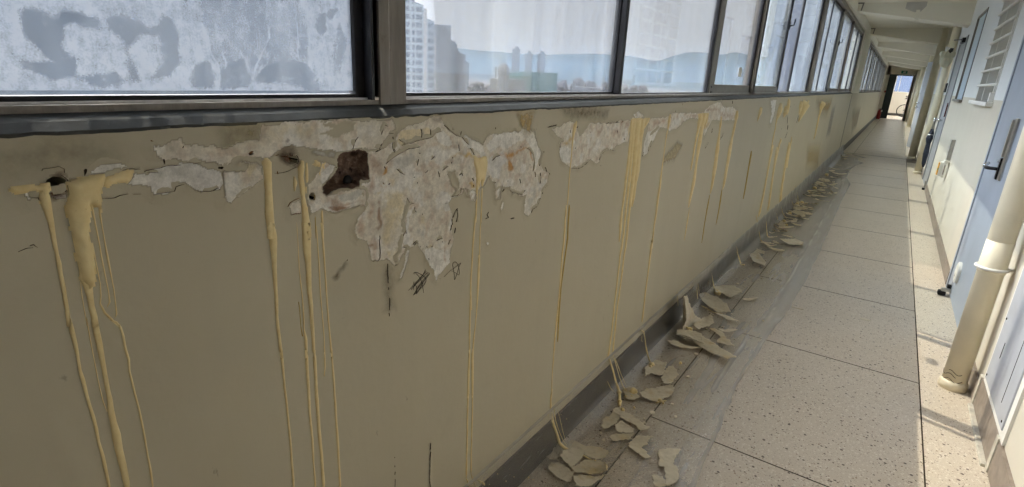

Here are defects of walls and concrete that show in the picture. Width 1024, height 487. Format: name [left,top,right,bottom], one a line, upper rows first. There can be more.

leakage [39,191,154,487]
leakage [293,160,341,487]
peeling [113,100,739,286]
leakage [466,177,484,478]
leakage [607,118,648,357]